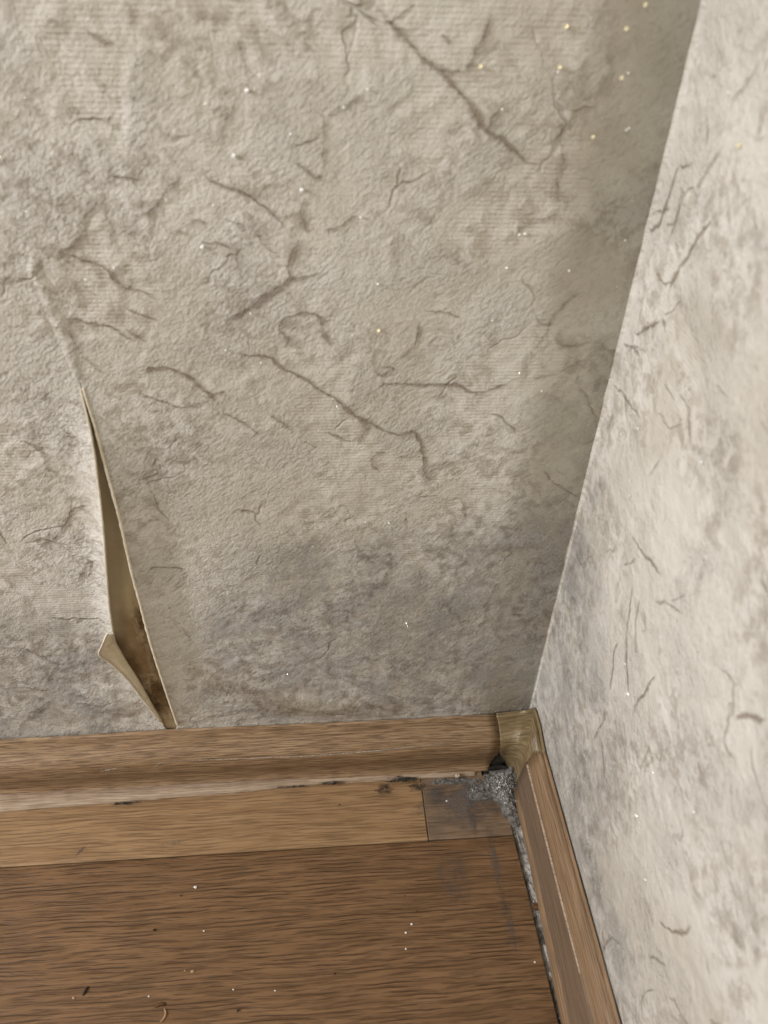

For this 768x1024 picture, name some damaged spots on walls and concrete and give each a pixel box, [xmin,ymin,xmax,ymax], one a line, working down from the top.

flaking render [84,398,177,729]